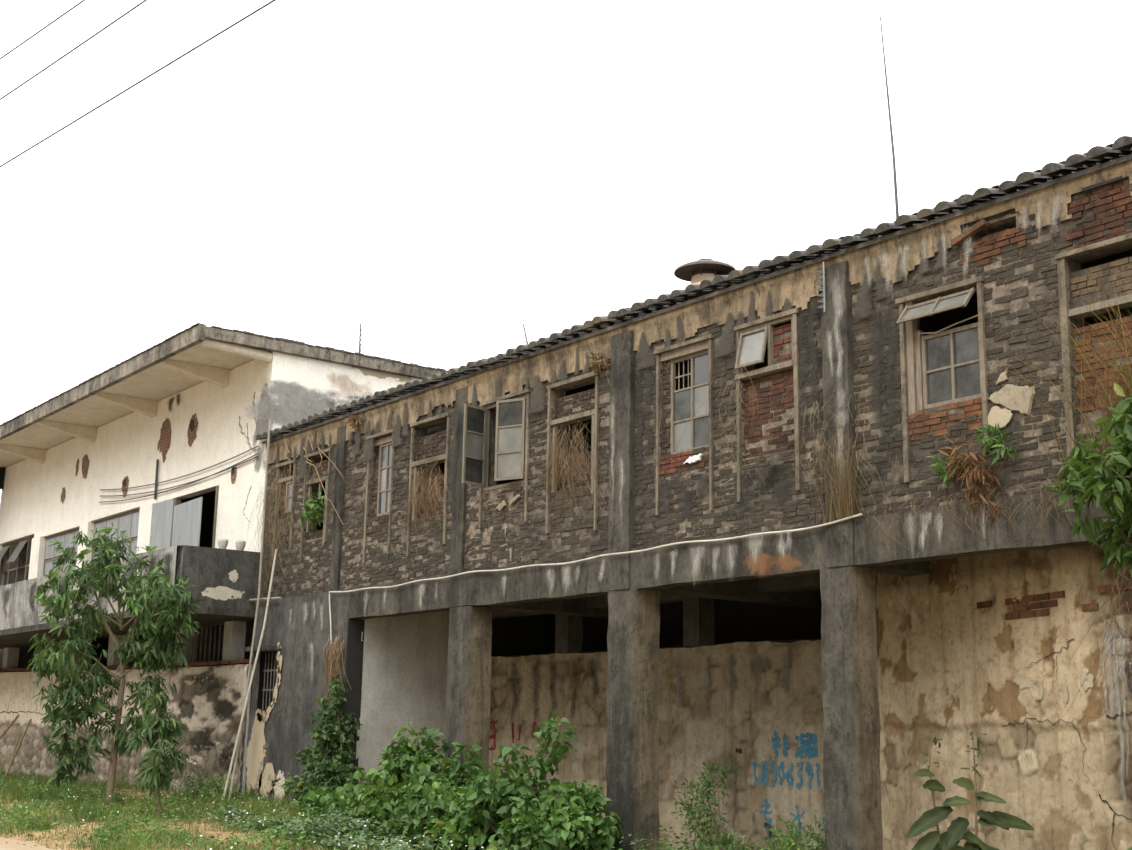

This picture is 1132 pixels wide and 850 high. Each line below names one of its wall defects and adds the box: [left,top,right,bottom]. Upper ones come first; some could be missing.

spalling [1066,176,1132,251]
water stain [716,291,841,442]
water stain [835,252,904,433]
flaking render [157,418,171,464]
flaking render [187,413,198,447]
water stain [247,381,409,537]
flaking render [201,569,245,600]
mould [178,667,235,722]
mould [190,727,239,772]
flaking render [243,642,285,801]
crack [1015,638,1074,686]
crack [1002,711,1132,850]